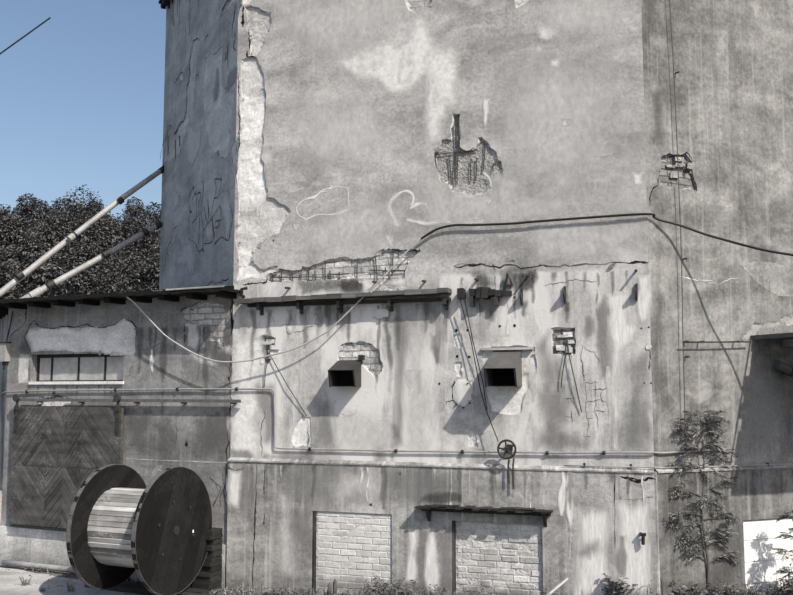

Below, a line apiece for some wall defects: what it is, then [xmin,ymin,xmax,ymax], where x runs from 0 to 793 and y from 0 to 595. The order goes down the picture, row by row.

flaking render [164,0,420,291]
flaking render [434,113,504,195]
flaking render [659,154,697,191]
flaking render [181,302,227,350]
leakage [137,328,187,377]
flaking render [338,341,383,381]
leakage [194,325,286,458]
crack [566,346,606,437]
flaking render [292,416,312,447]
leakage [228,468,254,517]
leakage [338,467,376,502]
leakage [280,496,293,574]